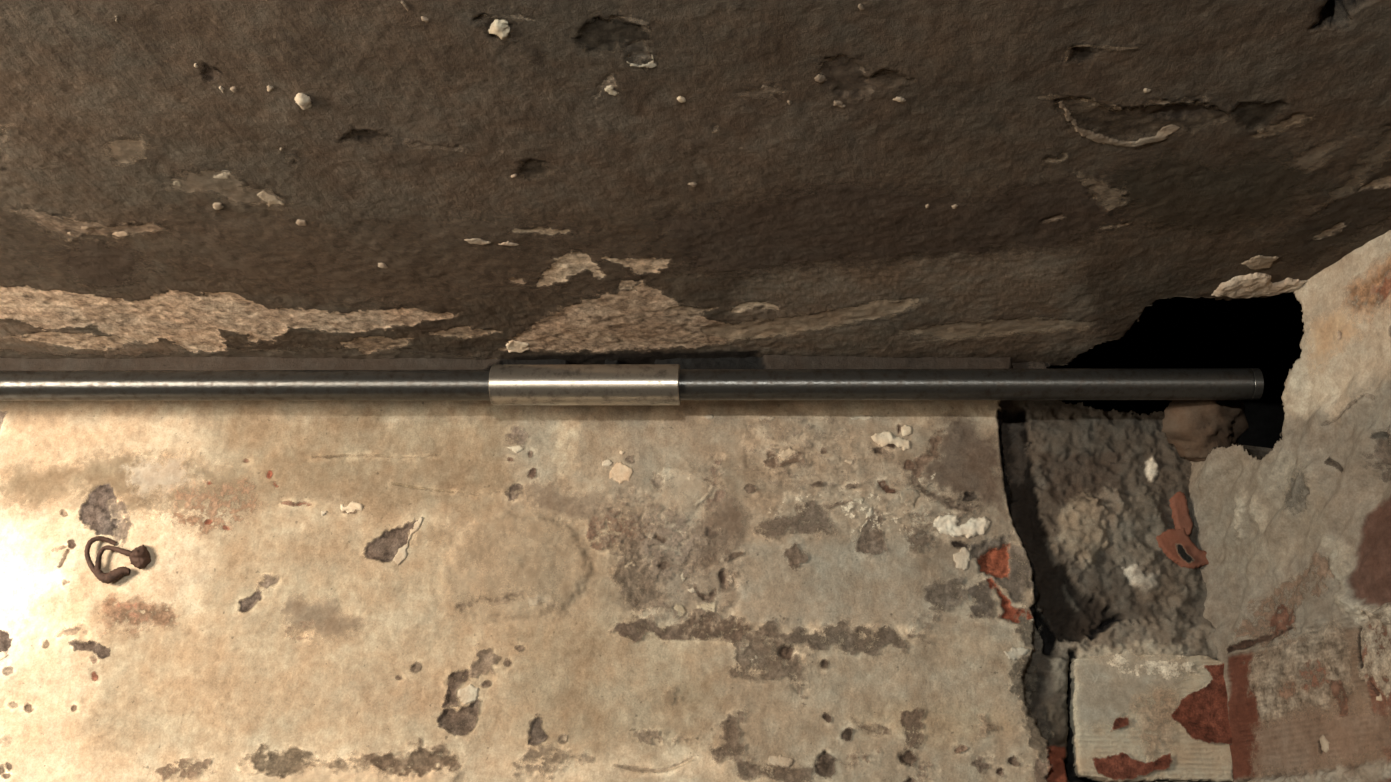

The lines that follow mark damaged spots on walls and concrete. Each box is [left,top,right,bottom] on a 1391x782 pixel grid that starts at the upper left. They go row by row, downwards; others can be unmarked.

peeling [512,226,570,236]
peeling [1313,222,1347,240]
peeling [464,238,519,246]
flaking render [0,230,401,314]
flaking render [1362,428,1391,470]
flaking render [1324,457,1343,473]
flaking render [1284,469,1309,513]
flaking render [1226,552,1335,653]
peeling [1171,663,1232,744]
peeling [1111,717,1129,731]
peeling [1318,735,1330,754]